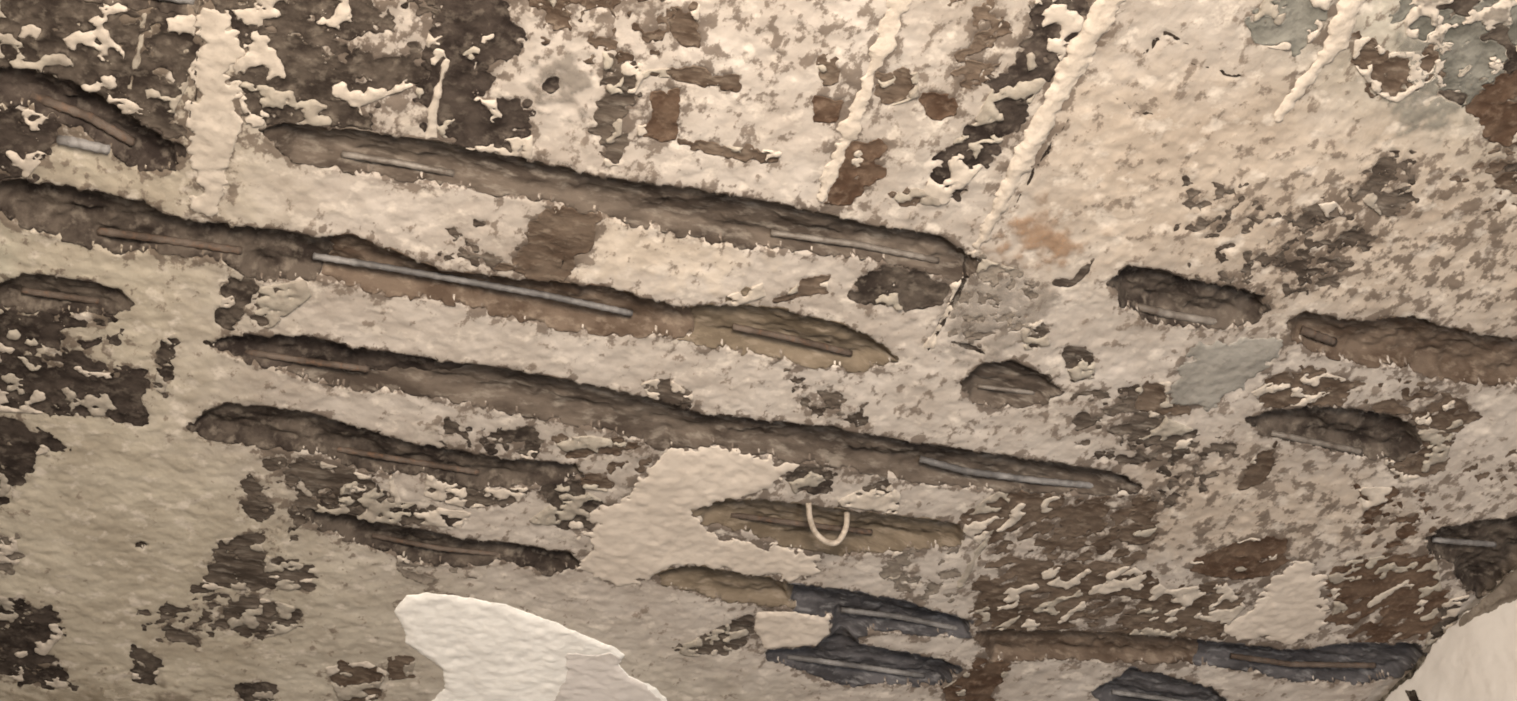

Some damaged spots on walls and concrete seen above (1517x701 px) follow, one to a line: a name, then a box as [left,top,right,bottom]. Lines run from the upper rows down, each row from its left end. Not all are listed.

spalling [0,0,1050,373]
peeling [874,0,1090,207]
peeling [1052,258,1095,287]
spalling [1106,150,1420,330]
peeling [1244,0,1331,57]
peeling [1350,0,1517,108]
peeling [1450,147,1517,214]
peeling [0,273,181,505]
peeling [0,596,79,691]
peeling [129,644,164,685]
peeling [136,473,319,648]
spalling [186,311,1517,701]